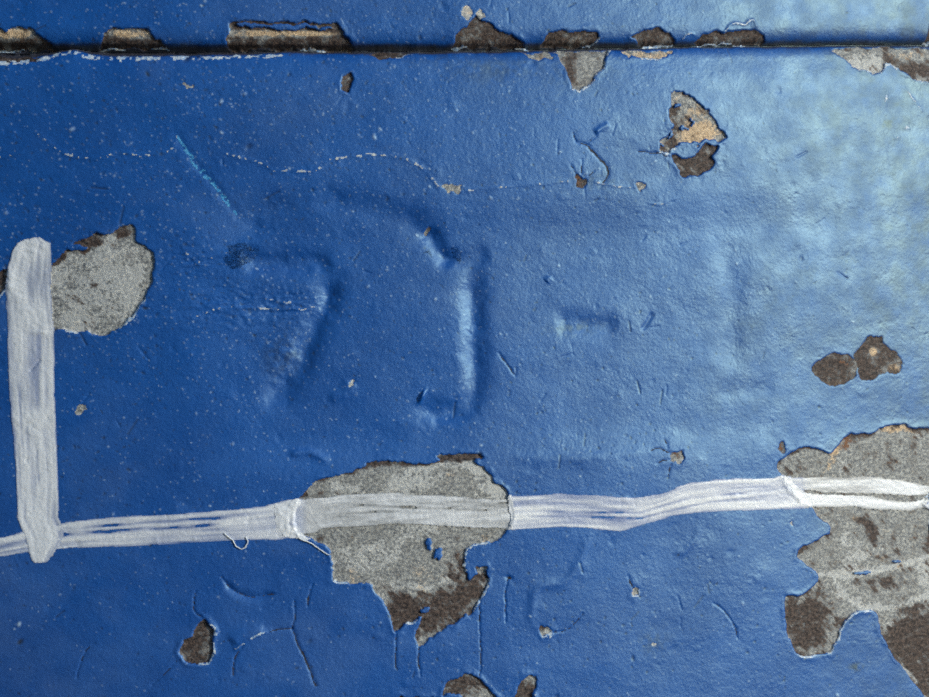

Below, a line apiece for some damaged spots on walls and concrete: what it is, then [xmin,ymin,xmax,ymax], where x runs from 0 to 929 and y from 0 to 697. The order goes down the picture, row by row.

peeling [0,20,354,66]
peeling [451,5,675,93]
peeling [694,29,765,47]
peeling [832,30,929,82]
peeling [659,91,726,178]
peeling [0,269,8,297]
peeling [50,225,155,336]
peeling [299,453,509,513]
peeling [303,523,506,646]
peeling [777,424,929,697]
peeling [179,619,214,665]
peeling [442,674,495,697]